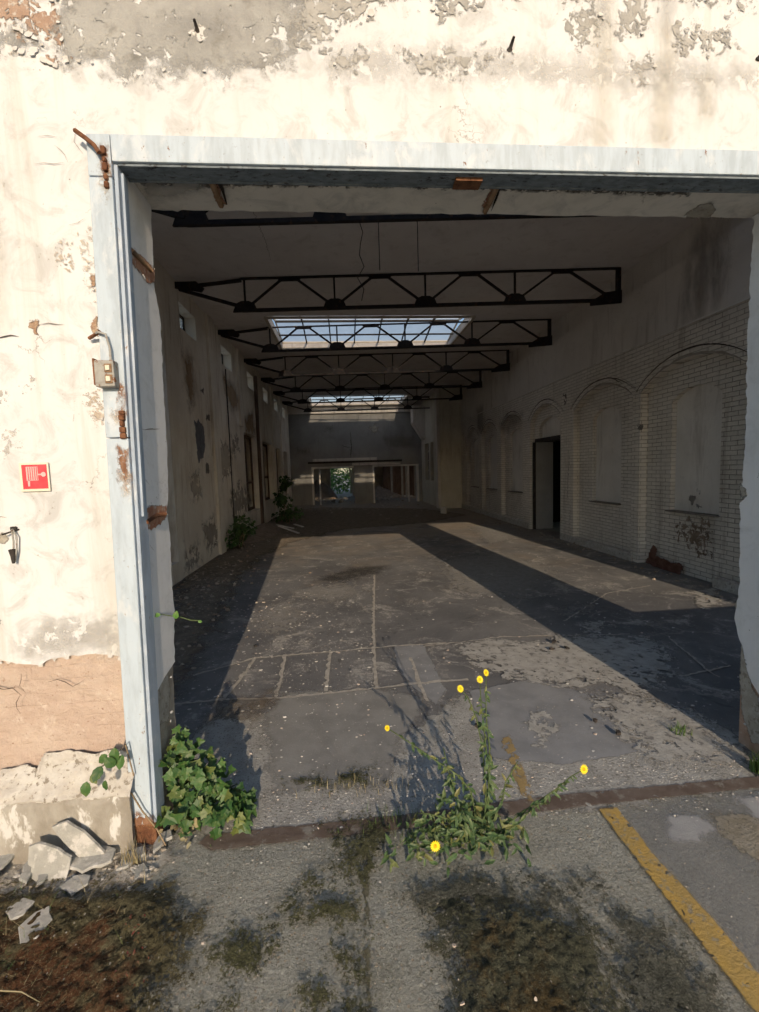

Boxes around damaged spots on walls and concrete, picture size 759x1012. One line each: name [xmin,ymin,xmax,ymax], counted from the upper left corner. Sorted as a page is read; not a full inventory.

peeling [0,0,396,84]
peeling [397,40,515,81]
peeling [430,0,487,24]
peeling [561,0,658,53]
peeling [630,54,657,87]
peeling [672,0,755,59]
leakage [186,518,218,569]
flaking render [0,654,127,770]